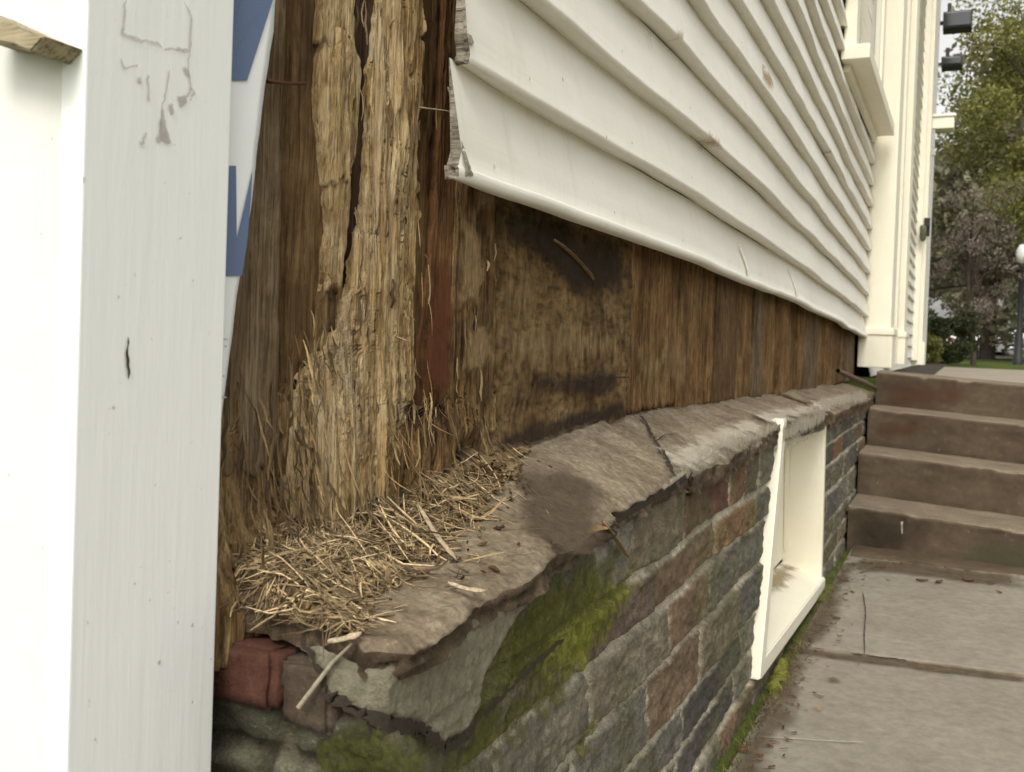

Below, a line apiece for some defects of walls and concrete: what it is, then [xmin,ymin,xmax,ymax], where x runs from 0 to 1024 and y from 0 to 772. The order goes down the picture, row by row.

peeling [121,0,196,145]
damp [504,215,622,294]
crack [124,337,132,379]
damp [502,368,625,447]
crack [578,336,681,490]
damp [521,470,601,553]